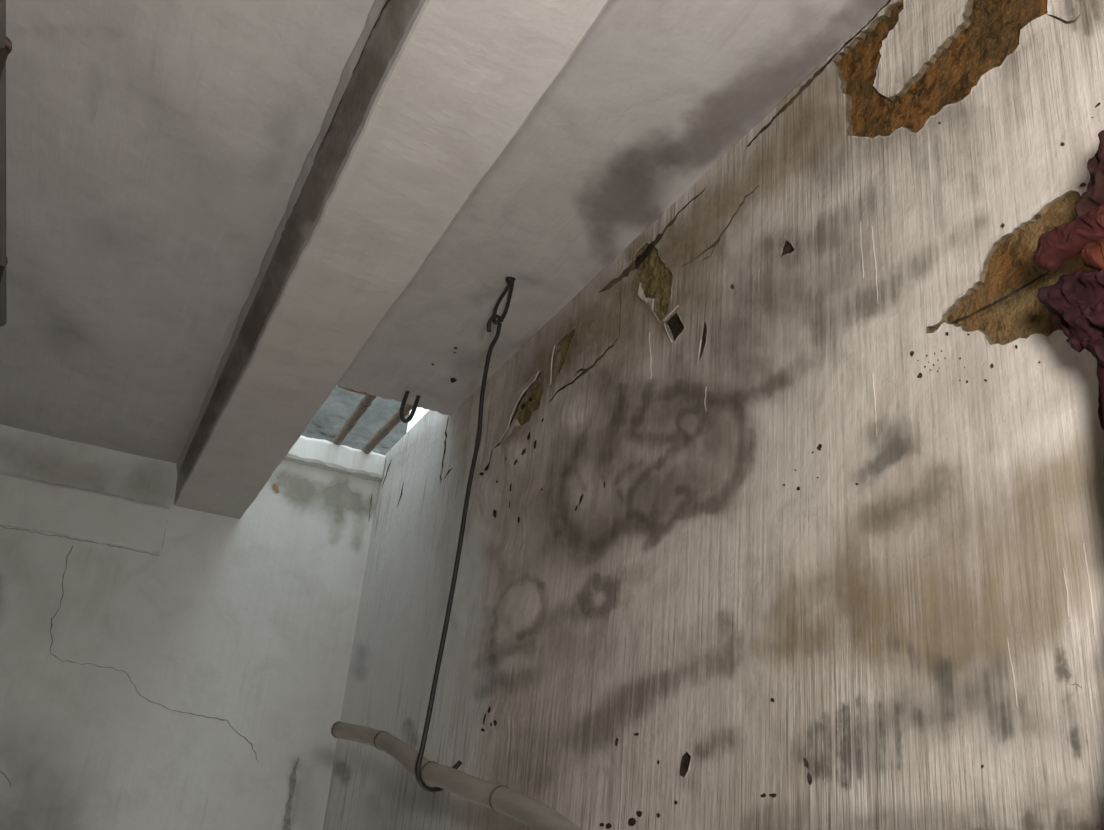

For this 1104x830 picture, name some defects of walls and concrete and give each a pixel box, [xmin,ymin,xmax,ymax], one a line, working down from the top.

crack [746,0,891,147]
flaking render [831,0,1054,141]
crack [549,187,706,402]
flaking render [634,242,685,343]
leakage [860,221,879,304]
flaking render [925,182,1099,349]
flaking render [487,327,576,470]
leakage [664,387,742,458]
leakage [554,467,713,561]
crack [0,525,258,761]
leakage [1083,541,1095,635]